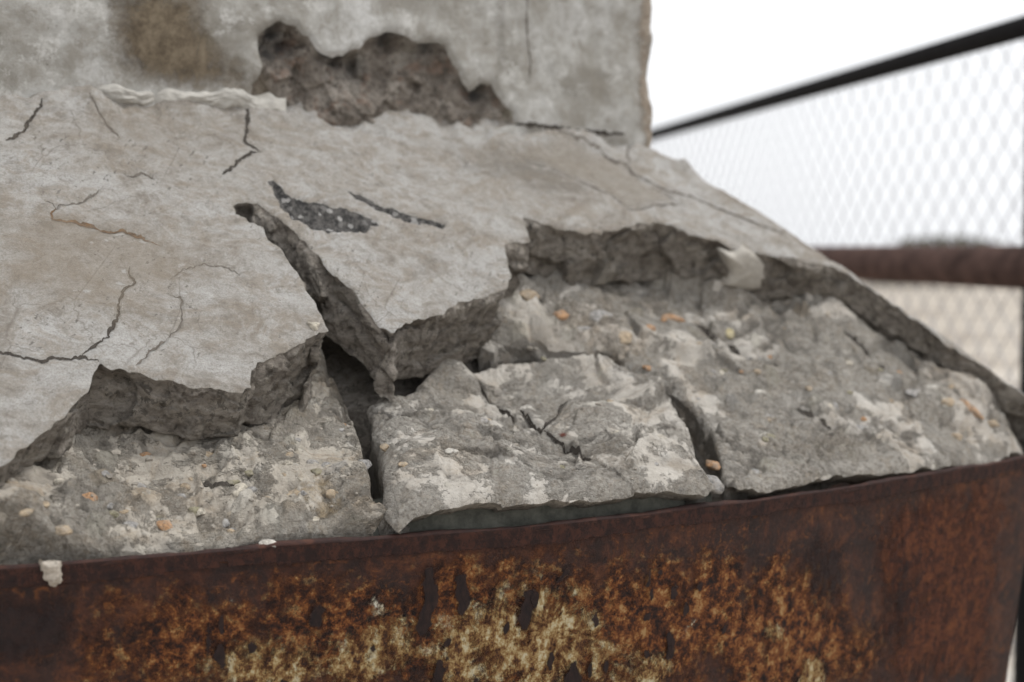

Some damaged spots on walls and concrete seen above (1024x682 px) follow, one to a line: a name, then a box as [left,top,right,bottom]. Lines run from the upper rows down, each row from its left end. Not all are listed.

crack [6,98,43,140]
crack [223,108,260,174]
spalling [251,21,515,129]
crack [47,189,158,245]
spalling [268,181,445,234]
crack [0,267,136,363]
crack [136,263,239,365]
crack [233,203,403,402]
spalling [395,218,1024,451]
spalling [0,331,328,489]
crack [480,386,592,461]
rust [0,458,1024,682]